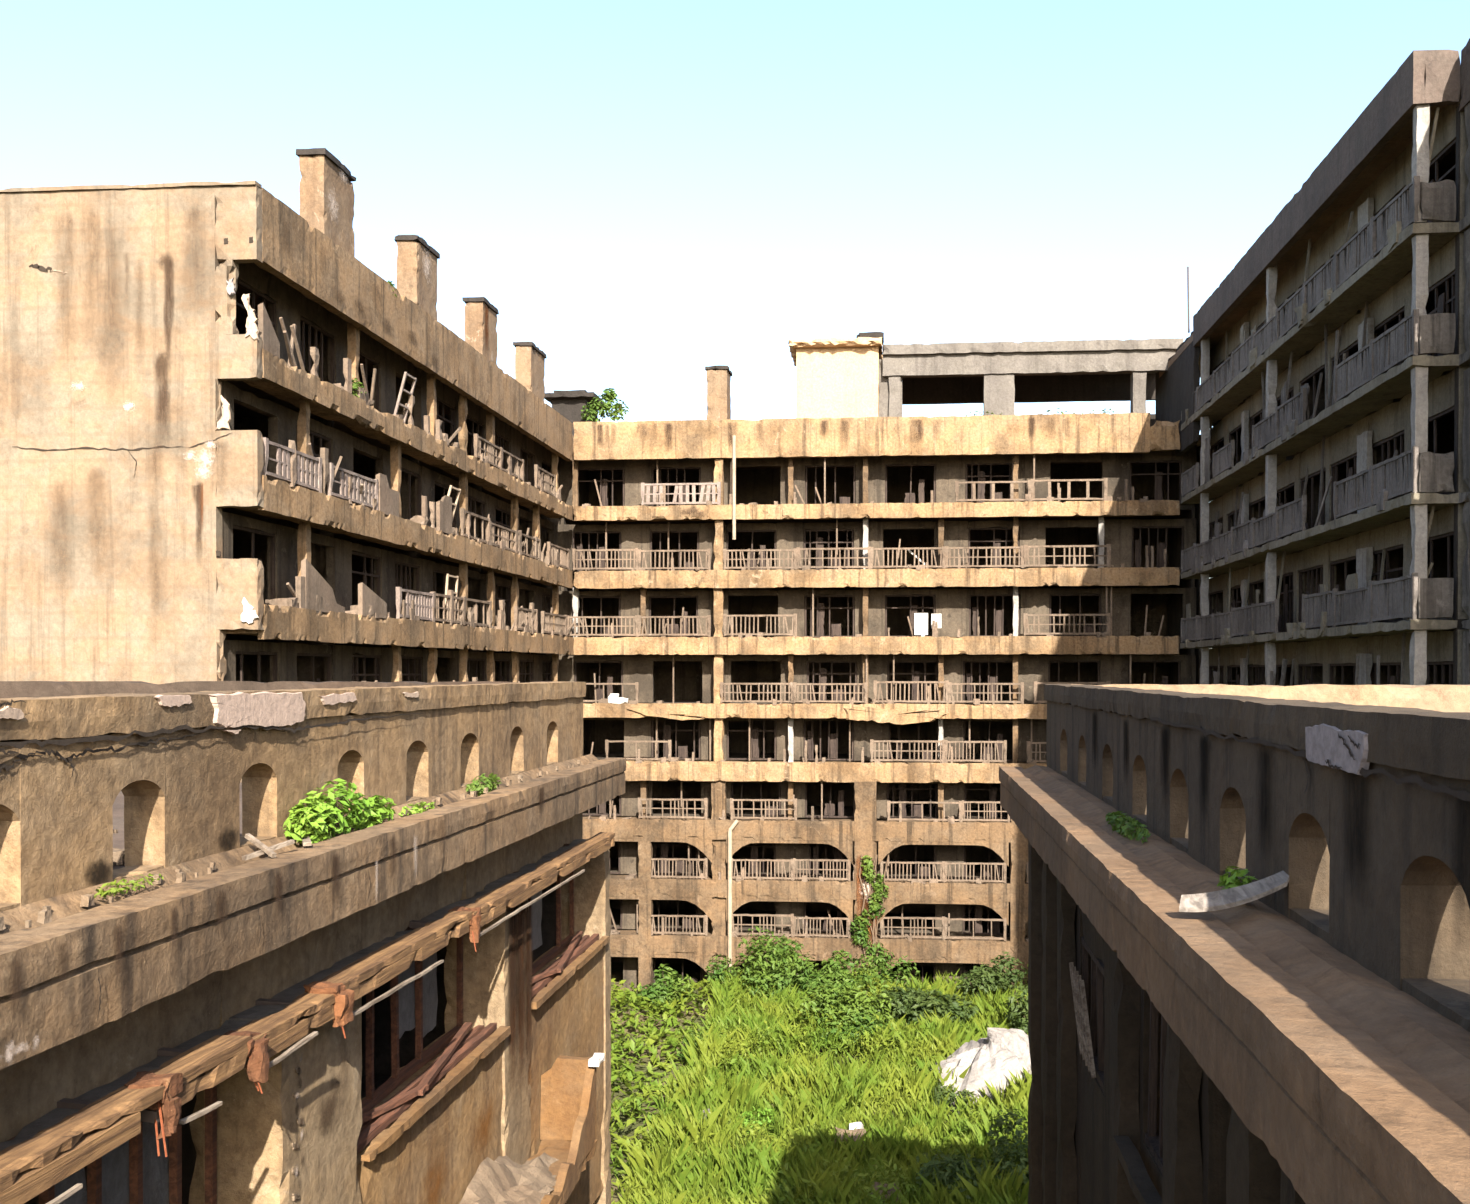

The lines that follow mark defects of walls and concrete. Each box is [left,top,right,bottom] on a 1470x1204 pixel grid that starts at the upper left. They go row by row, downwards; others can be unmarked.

leakage [156,257,173,422]
crack [14,433,231,475]
crack [0,699,424,777]
peeling [154,691,357,734]